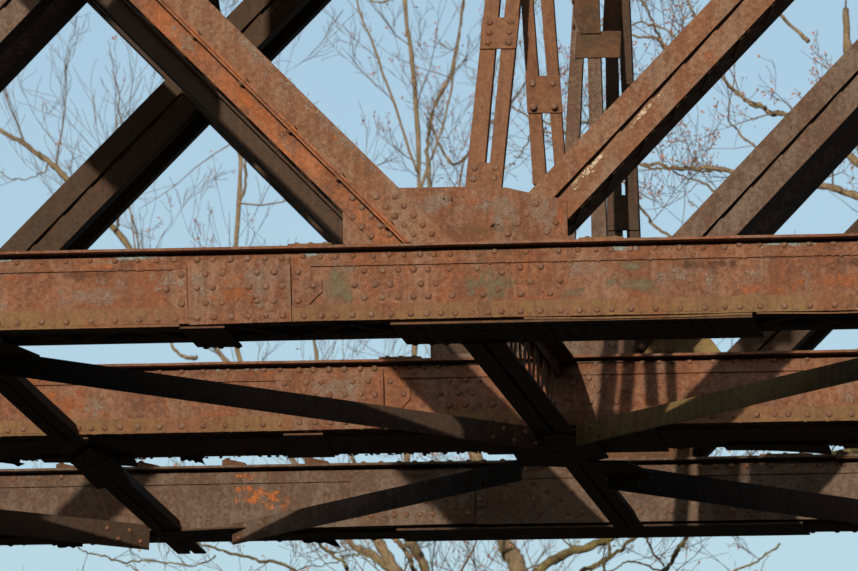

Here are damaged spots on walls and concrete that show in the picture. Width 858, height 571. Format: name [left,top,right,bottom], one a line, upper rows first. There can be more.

rust [235,473,289,512]